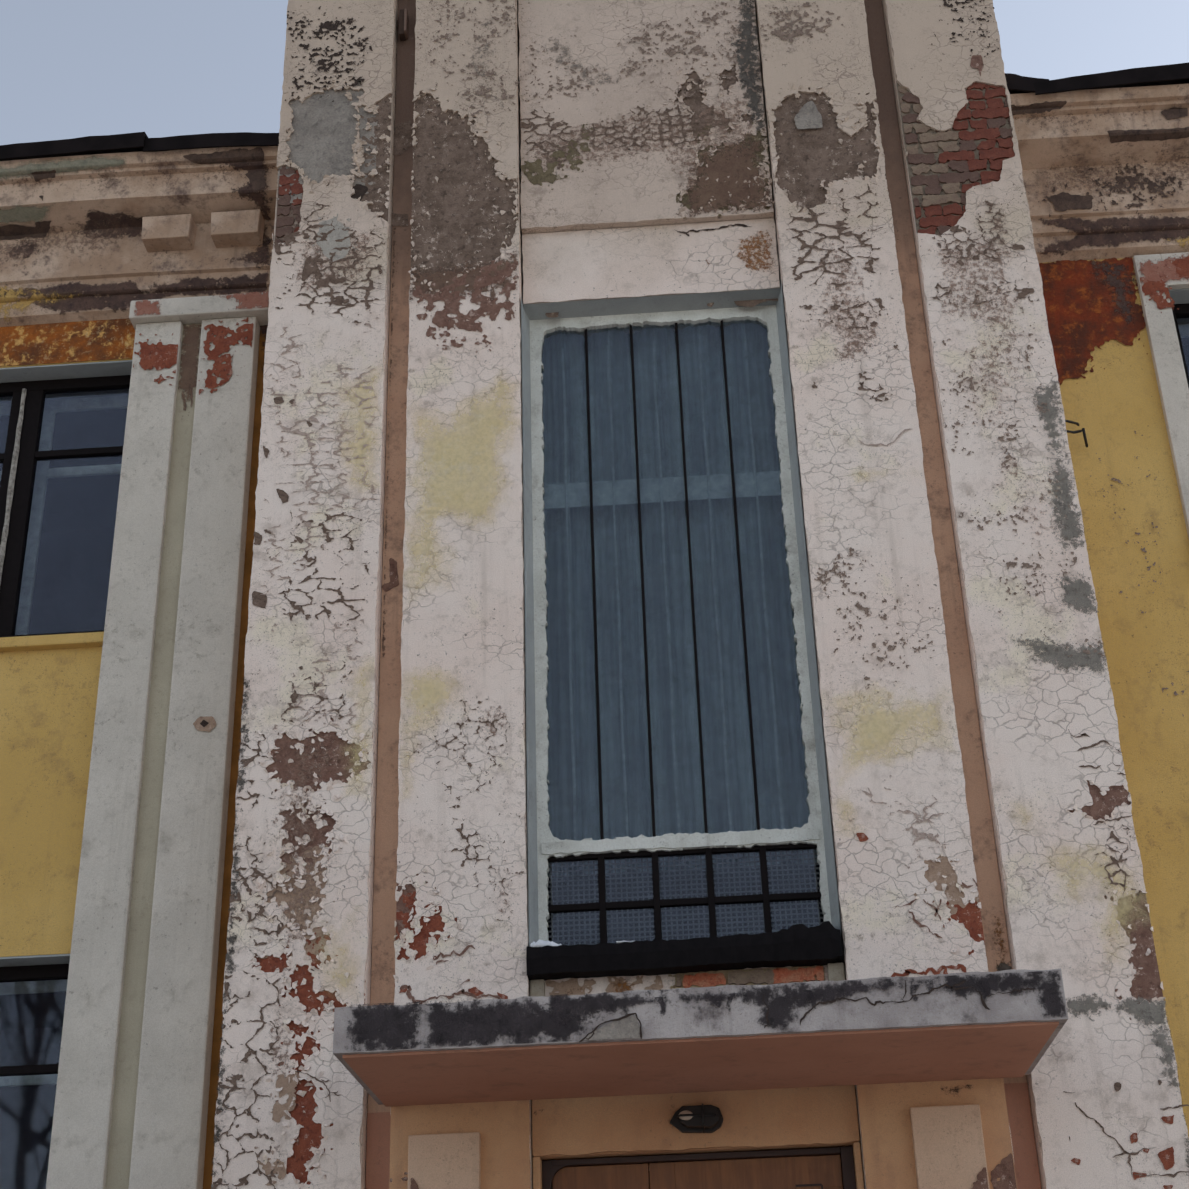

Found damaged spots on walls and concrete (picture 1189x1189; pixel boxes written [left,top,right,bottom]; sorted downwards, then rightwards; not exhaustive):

spalling [183,75,596,353]
crack [913,173,1039,329]
peeling [896,55,1067,236]
peeling [991,254,1189,387]
crack [237,178,386,808]
damp [1032,380,1086,554]
damp [1013,637,1107,673]
damp [1056,572,1099,615]
crack [211,832,339,1189]
peeling [248,715,373,1189]
damp [346,962,1182,1094]
crack [800,749,1034,1025]